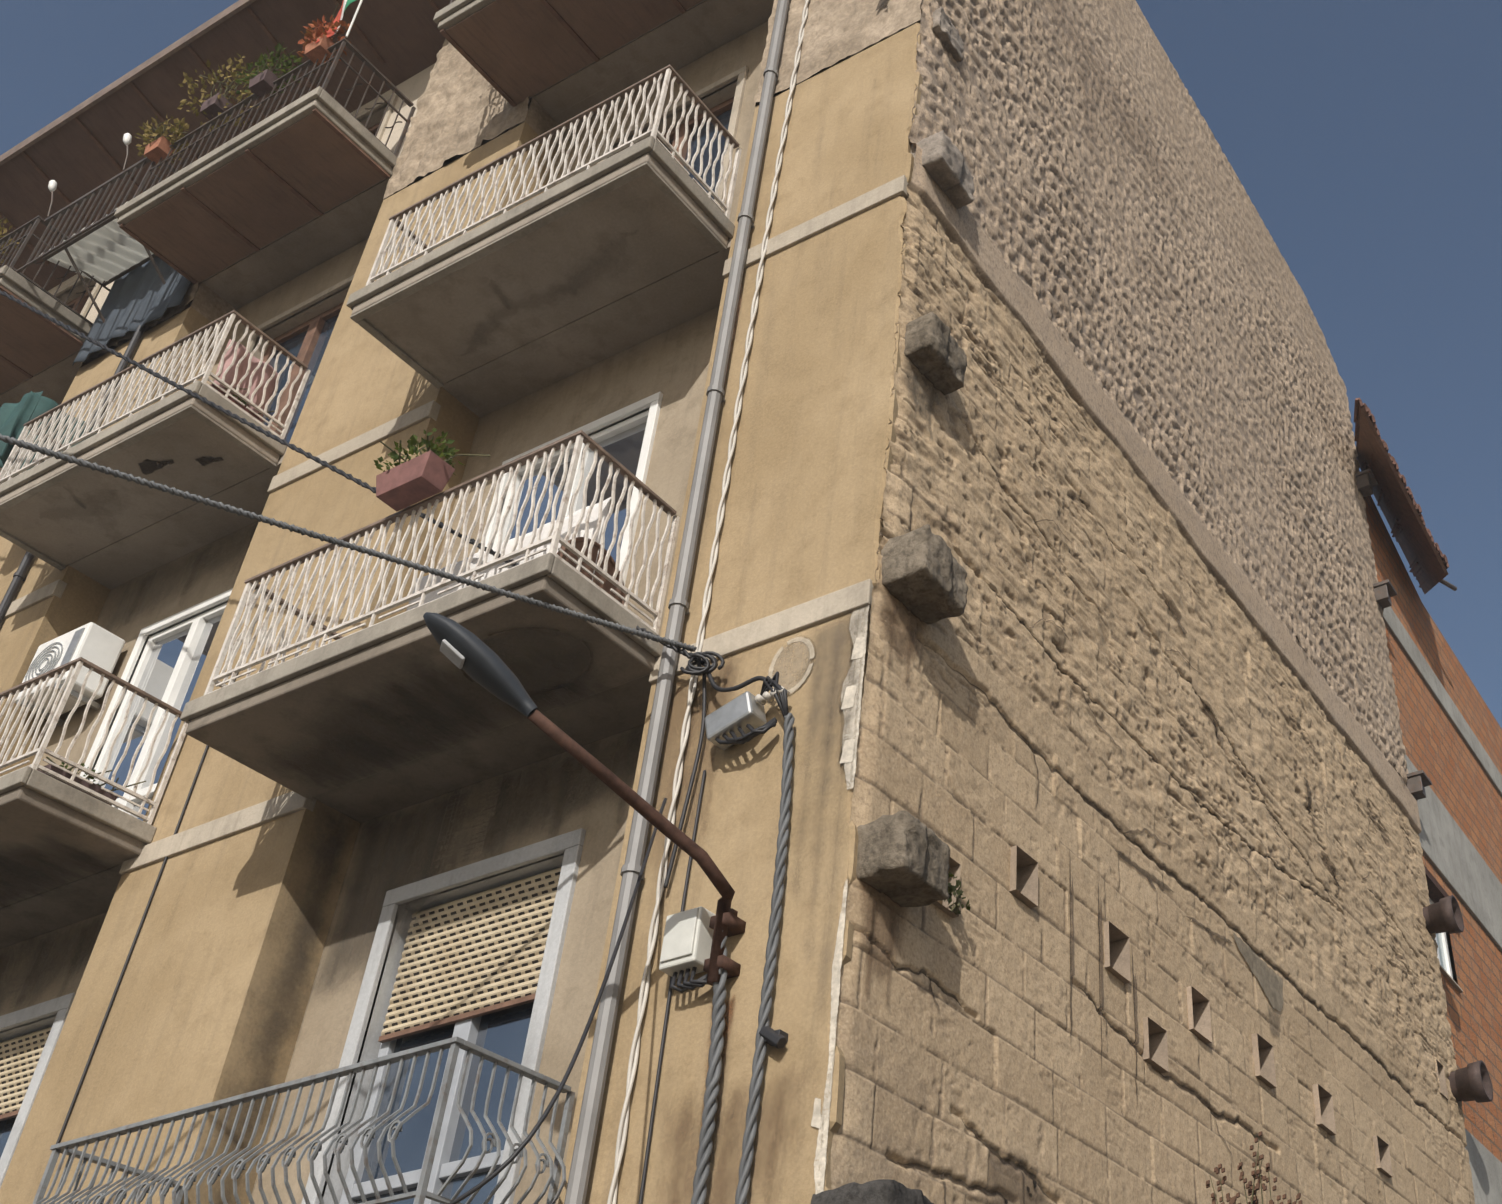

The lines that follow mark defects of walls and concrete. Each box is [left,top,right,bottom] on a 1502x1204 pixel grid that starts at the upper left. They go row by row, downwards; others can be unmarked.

crack [980,451,1092,603]
crack [971,569,1376,906]
crack [863,933,962,1011]
crack [924,645,1459,1155]
crack [897,1120,1049,1204]